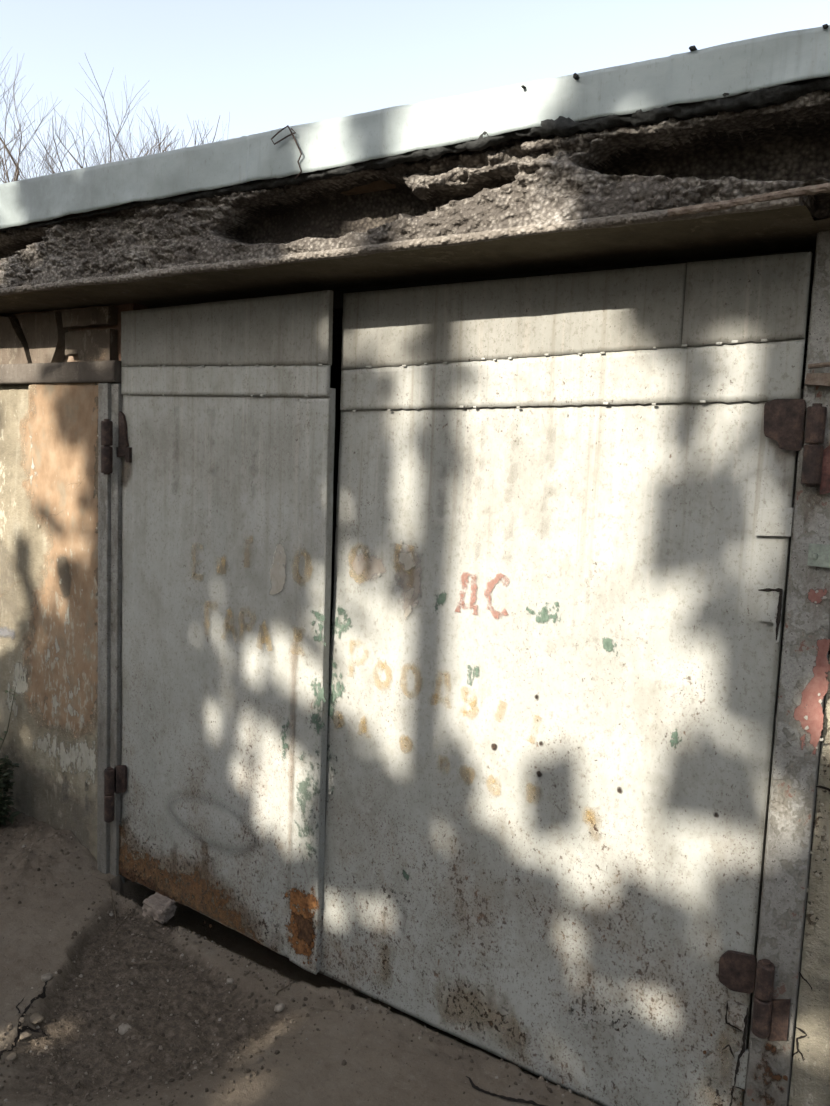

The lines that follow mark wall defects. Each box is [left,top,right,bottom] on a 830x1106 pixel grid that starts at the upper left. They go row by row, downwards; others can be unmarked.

spalling [588,117,830,182]
spalling [224,175,515,244]
spalling [803,193,830,218]
spalling [0,236,44,259]
peeling [2,383,99,785]
rust [119,821,320,969]